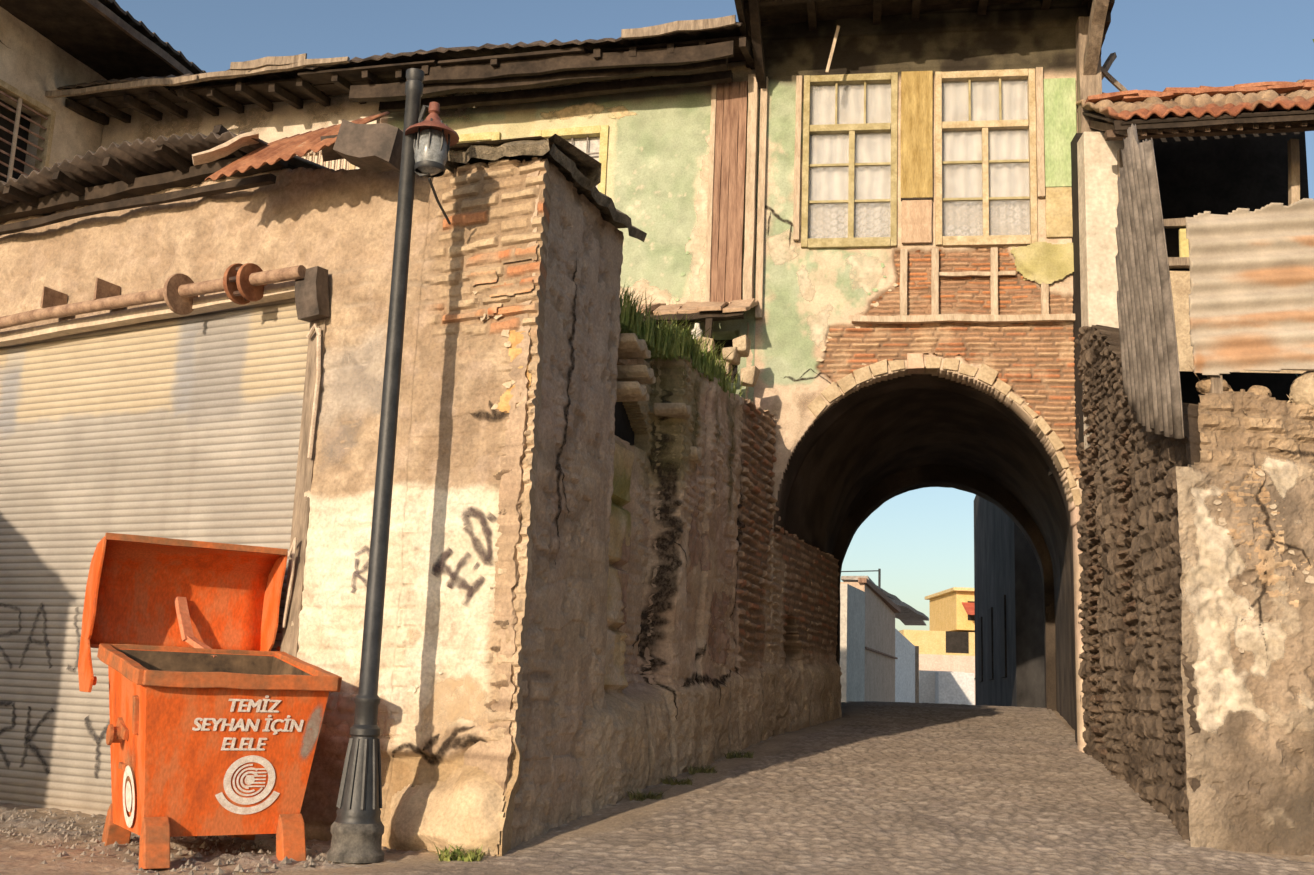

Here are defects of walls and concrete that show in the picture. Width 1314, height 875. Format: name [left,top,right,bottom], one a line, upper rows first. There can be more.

spalling [466,243,538,413]
spalling [767,230,1081,479]
peeling [1185,457,1314,731]
crack [1241,448,1314,666]